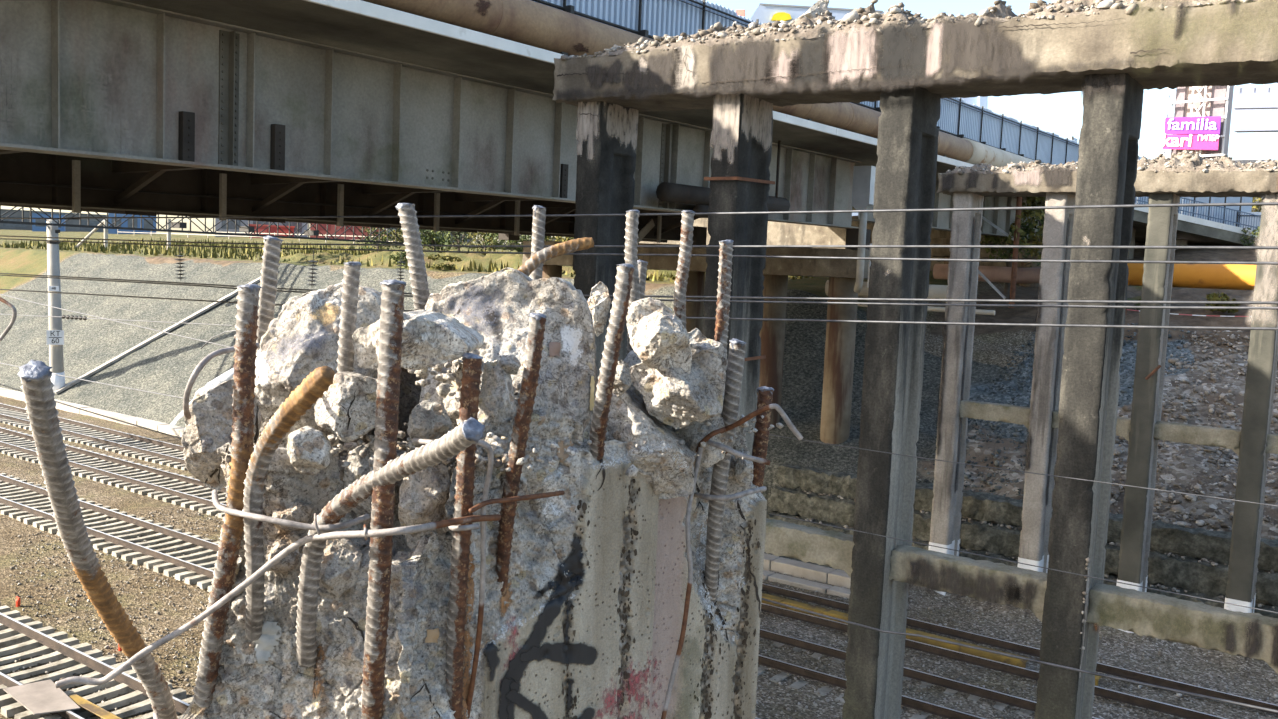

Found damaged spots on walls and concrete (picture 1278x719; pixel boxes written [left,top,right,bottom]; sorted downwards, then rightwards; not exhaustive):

damp [556,24,964,163]
damp [994,59,1130,98]
corrosion [310,301,340,327]
spalling [694,508,722,630]
damp [1226,619,1278,668]
corrosion [313,645,326,697]